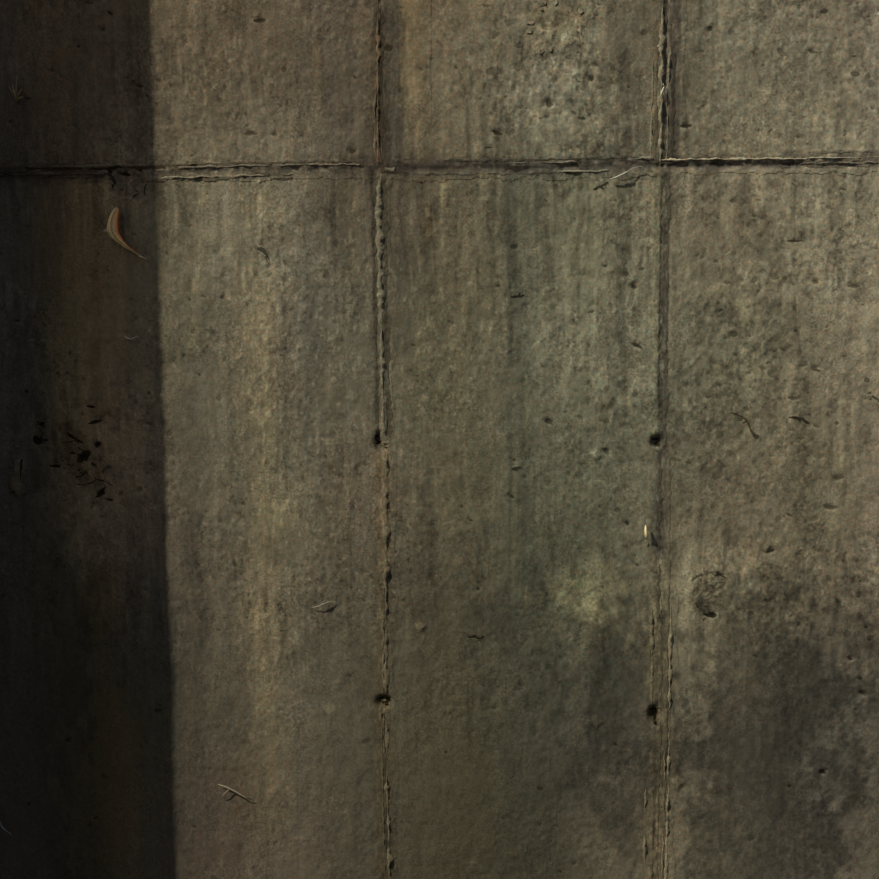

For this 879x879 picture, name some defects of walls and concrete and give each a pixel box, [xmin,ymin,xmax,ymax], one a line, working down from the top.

damp [672,172,879,879]